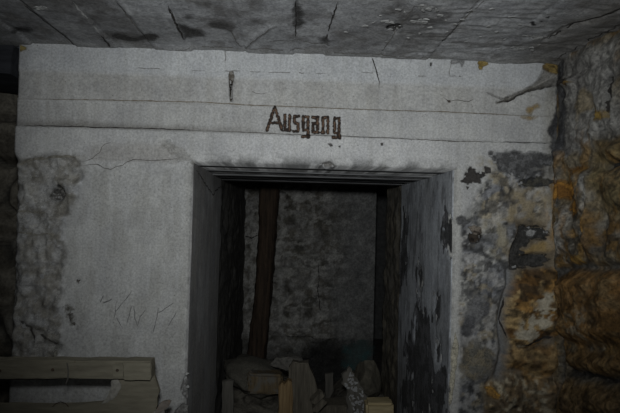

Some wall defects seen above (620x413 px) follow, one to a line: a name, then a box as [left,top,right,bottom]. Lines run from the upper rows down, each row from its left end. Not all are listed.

crack [168,1,435,83]
crack [83,143,180,170]
peeling [461,150,554,189]
spalling [12,154,80,357]
peeling [440,205,452,259]
peeling [509,224,549,270]
peeling [399,257,459,413]